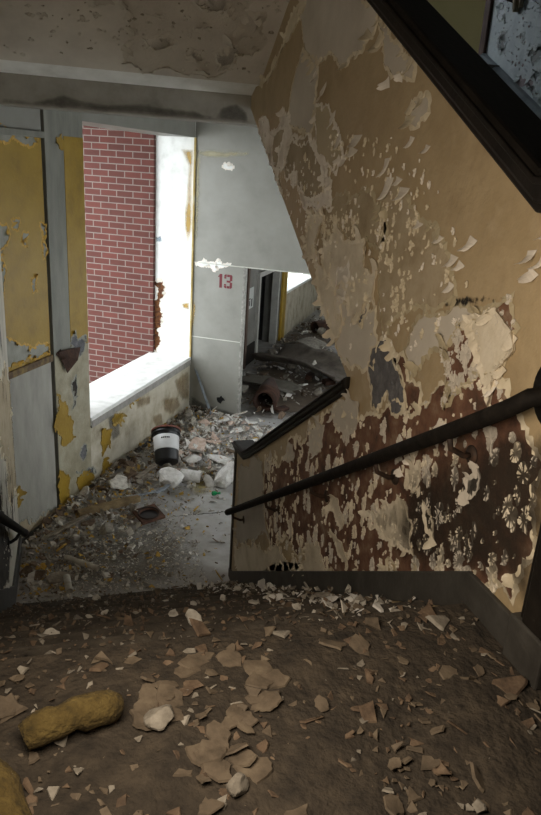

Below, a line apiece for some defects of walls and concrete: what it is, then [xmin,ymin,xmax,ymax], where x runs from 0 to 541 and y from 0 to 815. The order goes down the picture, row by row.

peeling [0,217,29,296]
peeling [0,336,50,515]
peeling [0,523,14,589]